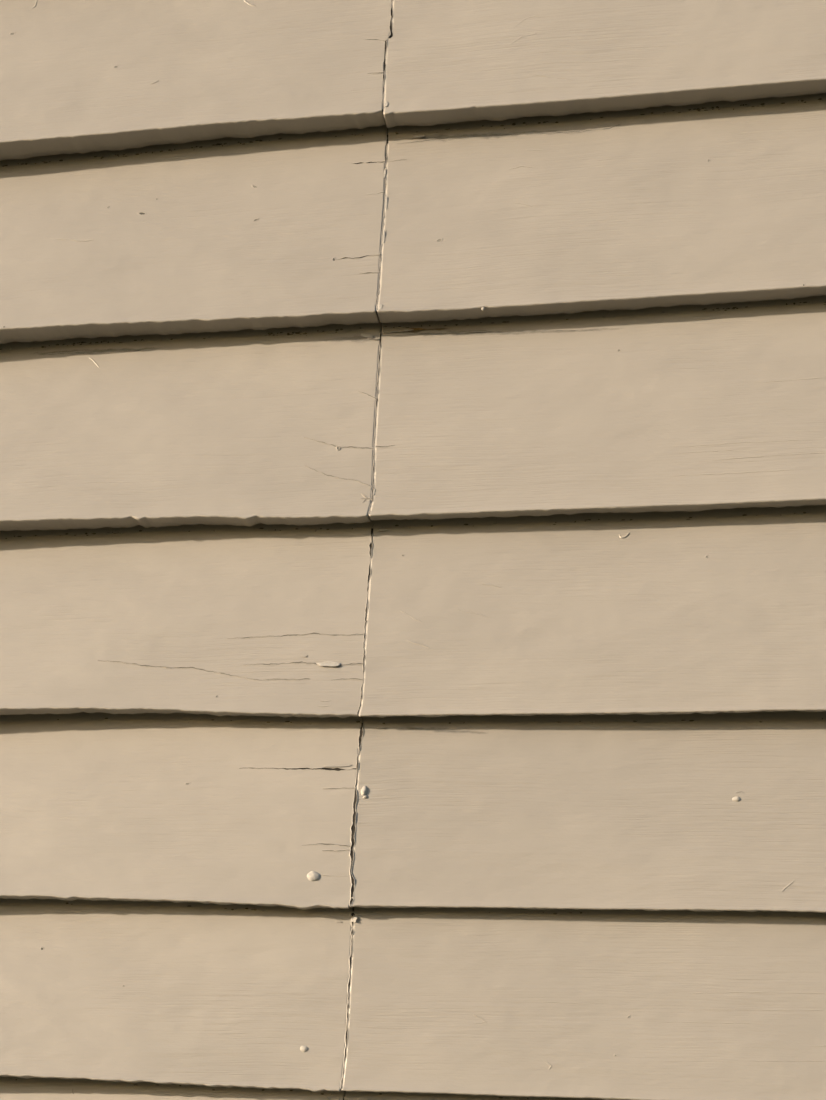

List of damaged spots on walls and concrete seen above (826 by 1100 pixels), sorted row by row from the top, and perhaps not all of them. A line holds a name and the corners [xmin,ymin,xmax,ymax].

crack [98,0,407,1100]